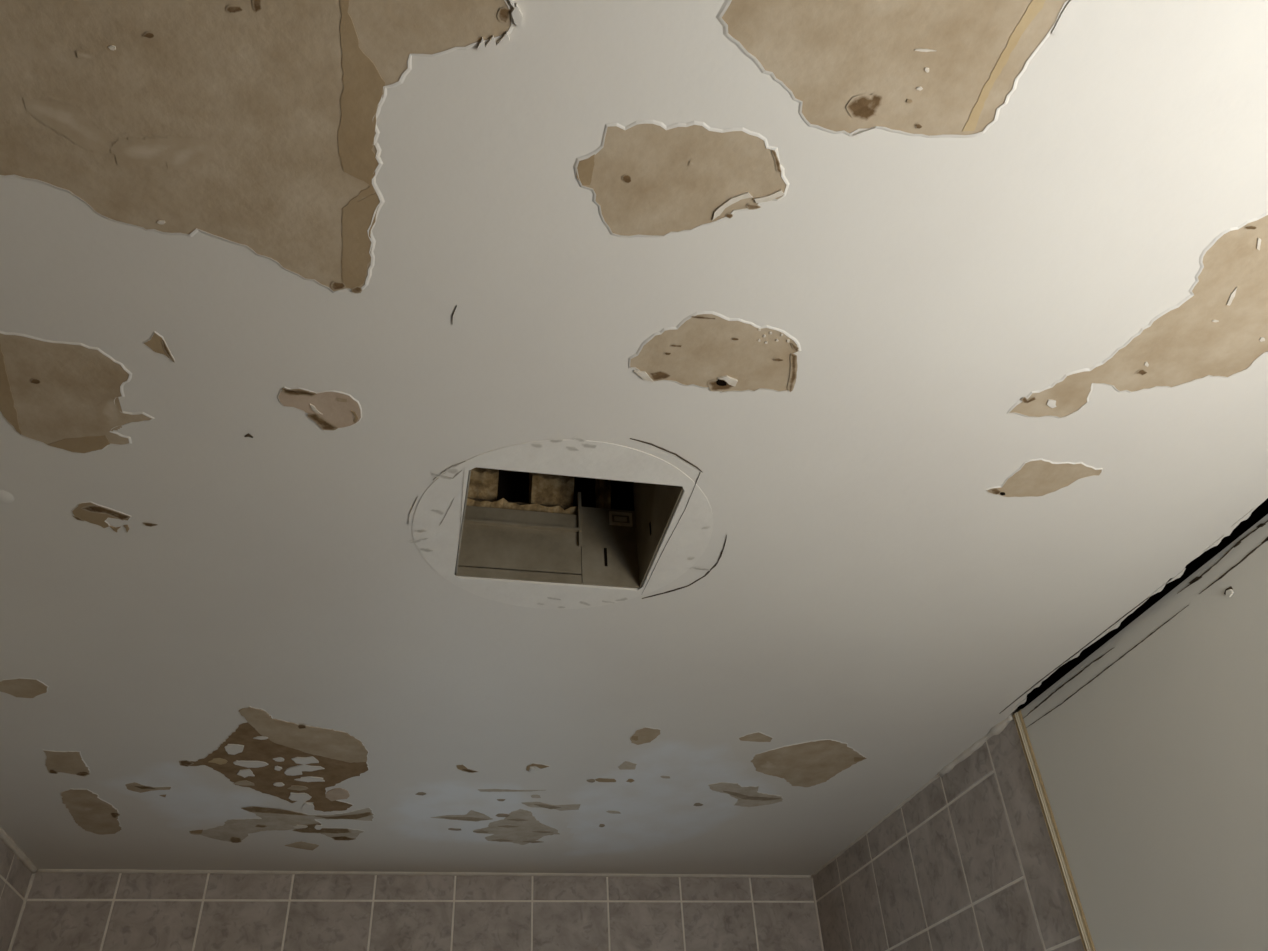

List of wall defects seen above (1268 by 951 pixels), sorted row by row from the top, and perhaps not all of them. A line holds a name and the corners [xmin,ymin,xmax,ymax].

peeling [716,0,1078,138]
peeling [0,0,522,294]
peeling [573,120,790,238]
peeling [0,331,155,454]
peeling [277,386,362,430]
peeling [628,311,801,393]
peeling [1007,212,1268,419]
peeling [986,458,1103,497]
crack [999,521,1268,728]
peeling [179,706,375,850]
peeling [431,789,581,845]
peeling [708,732,867,807]